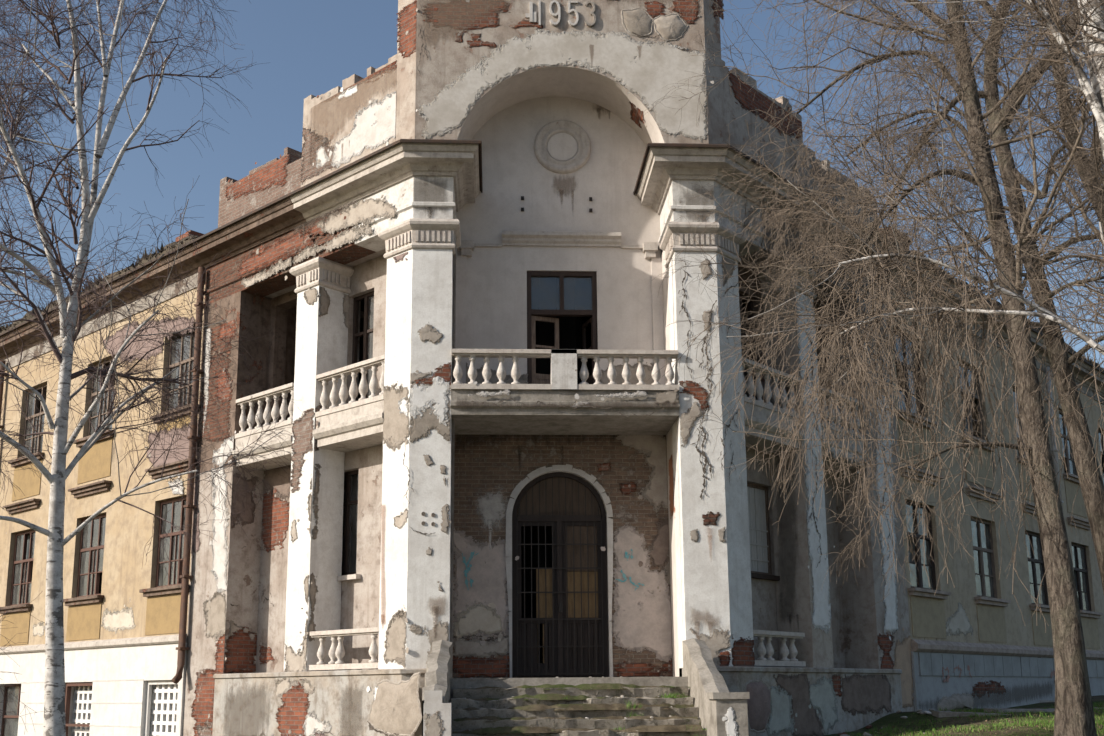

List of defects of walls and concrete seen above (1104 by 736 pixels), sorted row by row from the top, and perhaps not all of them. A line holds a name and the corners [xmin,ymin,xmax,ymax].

flaking render [317,0,510,104]
flaking render [513,20,543,29]
flaking render [644,0,725,24]
flaking render [628,92,647,128]
flaking render [728,71,806,141]
flaking render [225,127,344,201]
crack [679,261,739,500]
flaking render [228,403,322,553]
flaking render [191,572,325,736]
flaking render [383,610,449,669]
flaking render [453,633,510,678]
flaking render [615,660,672,677]